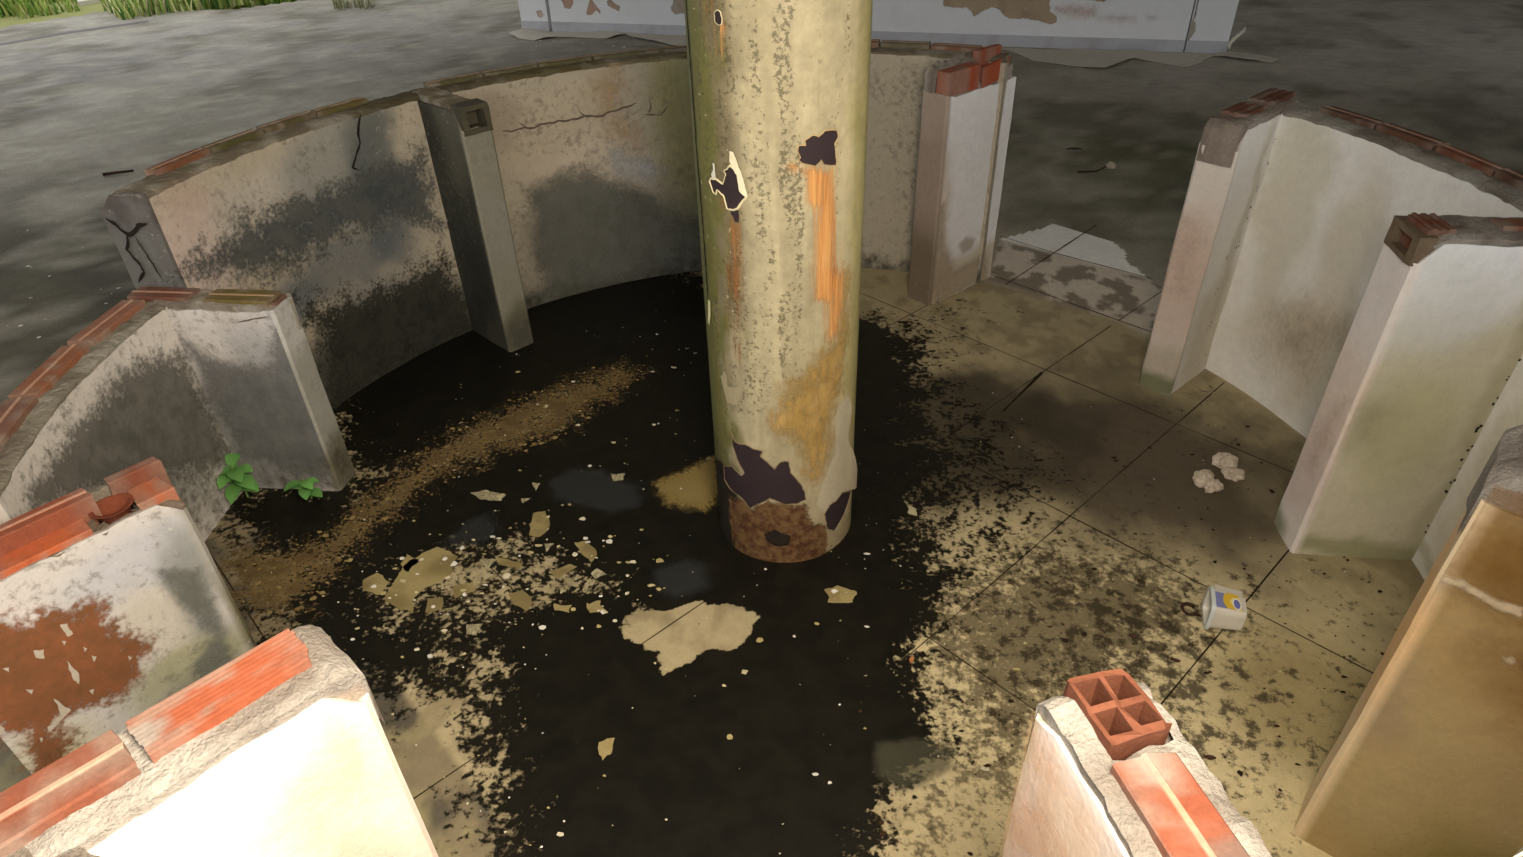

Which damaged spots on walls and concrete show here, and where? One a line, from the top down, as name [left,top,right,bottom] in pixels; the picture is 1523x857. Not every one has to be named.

peeling [561,0,620,15]
peeling [941,0,1059,26]
crack [352,114,361,171]
crack [503,0,708,296]
peeling [709,151,748,222]
crack [105,218,164,282]
rust [769,164,850,481]
peeling [721,372,743,405]
peeling [723,394,857,531]
damp [27,148,1086,857]
rust [656,456,827,563]